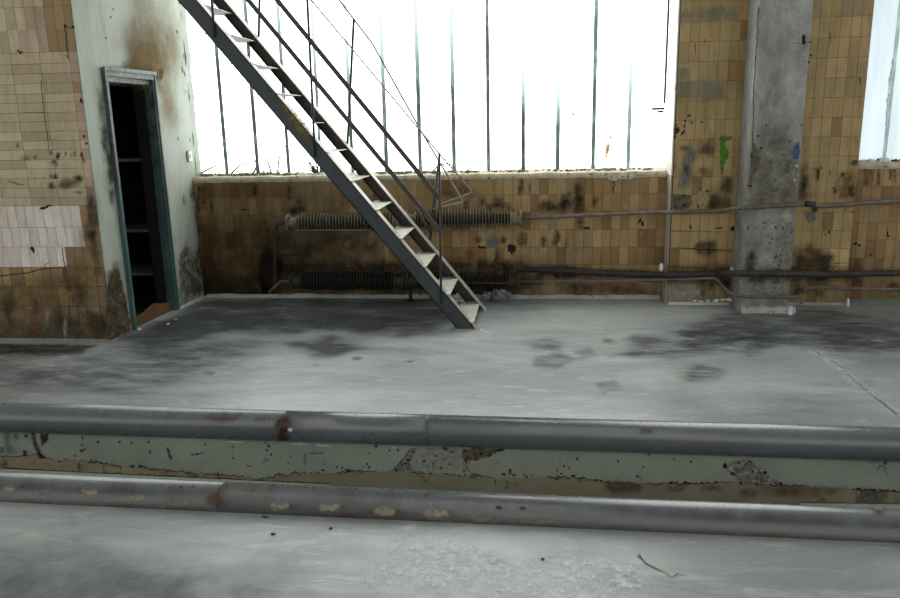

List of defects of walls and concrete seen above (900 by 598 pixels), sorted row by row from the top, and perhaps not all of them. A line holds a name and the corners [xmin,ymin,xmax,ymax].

water stain [123,248,446,355]
water stain [627,310,900,355]
crack [812,348,898,415]
spalling [0,428,900,505]